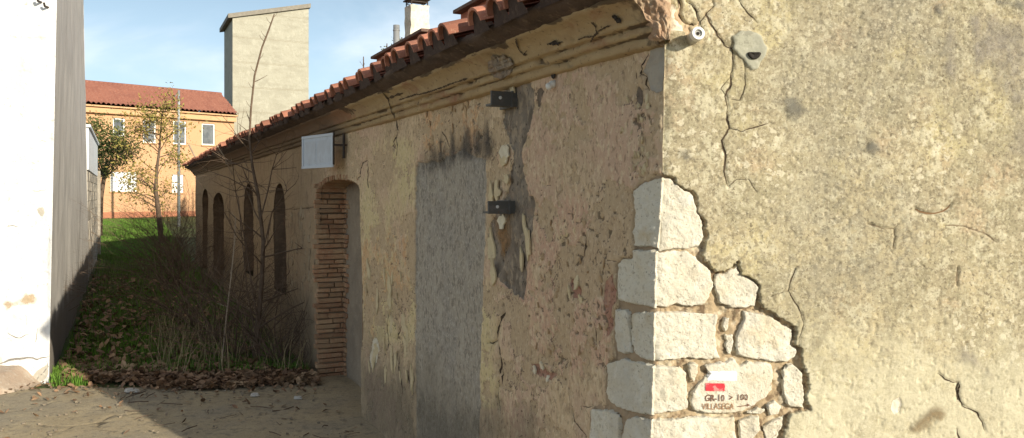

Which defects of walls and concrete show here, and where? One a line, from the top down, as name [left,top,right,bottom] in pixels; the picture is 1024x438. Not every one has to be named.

flaking render [487,83,551,300]
crack [677,0,770,193]
flaking render [554,177,804,438]
crack [938,373,984,438]